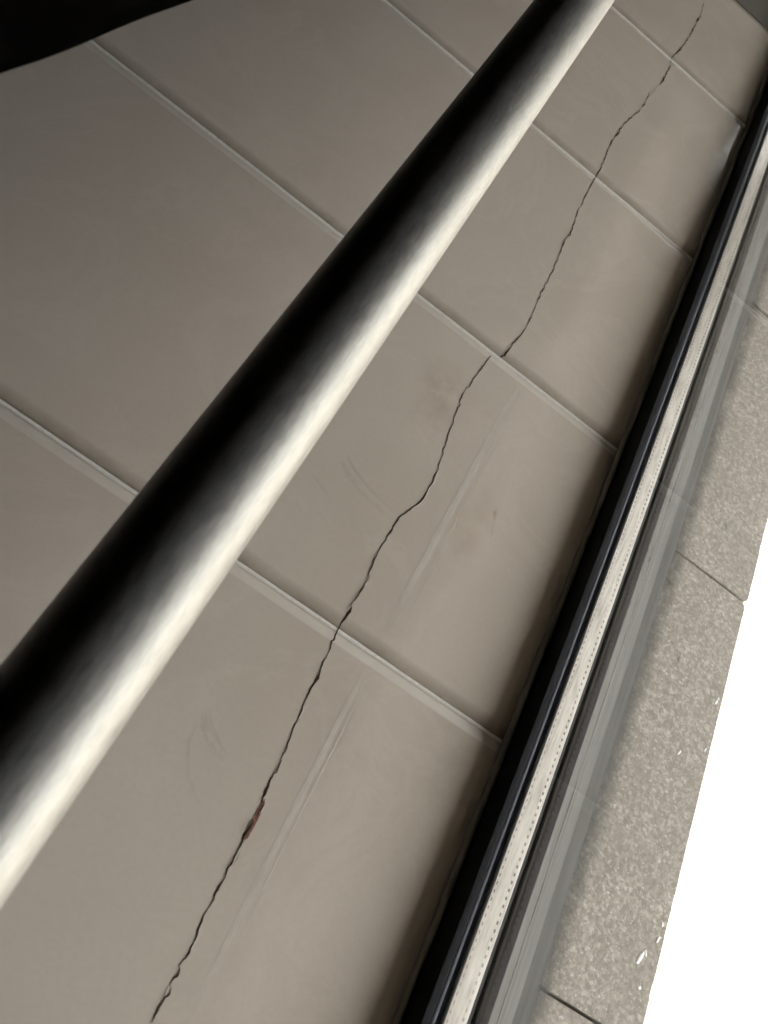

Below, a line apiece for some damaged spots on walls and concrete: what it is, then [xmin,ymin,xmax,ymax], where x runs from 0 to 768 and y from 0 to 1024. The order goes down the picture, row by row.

crack [151,2,704,1024]